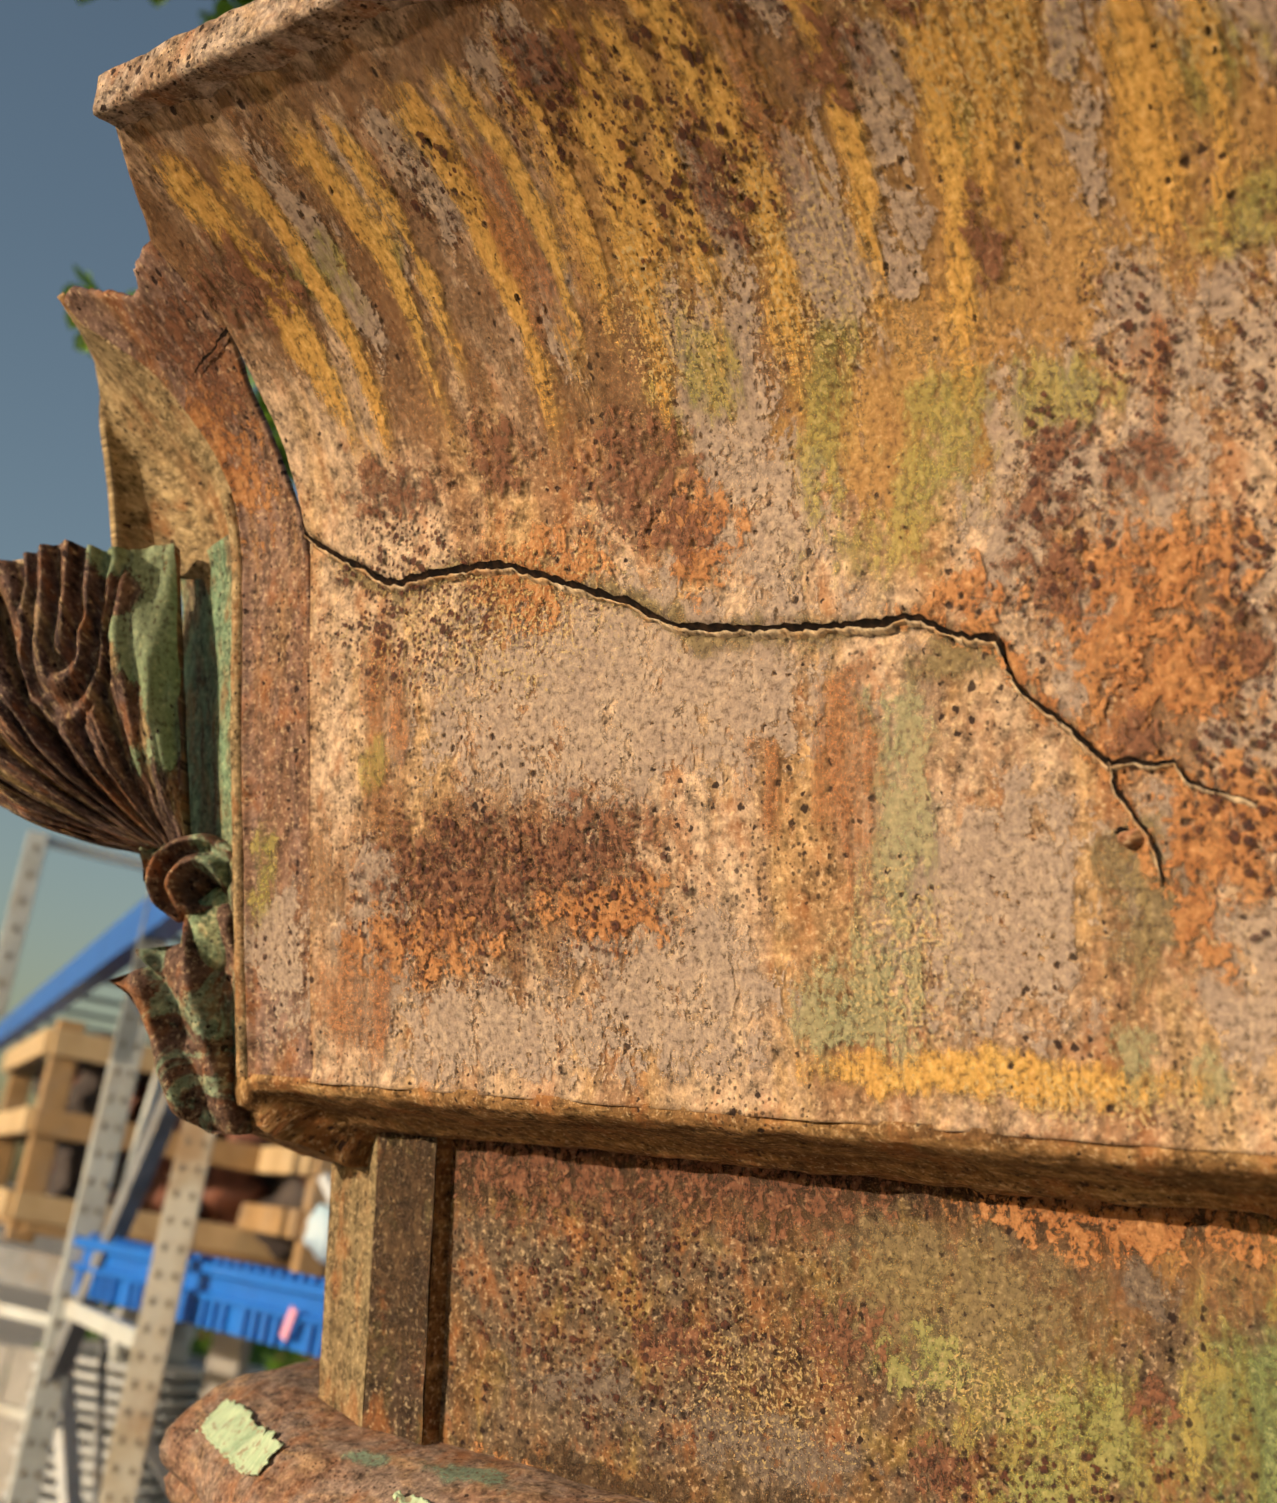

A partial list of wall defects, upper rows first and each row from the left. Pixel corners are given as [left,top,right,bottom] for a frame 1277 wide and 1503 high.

leakage [387,0,810,426]
leakage [783,0,888,316]
leakage [892,0,1038,377]
leakage [1096,0,1241,263]
corrosion [127,0,1277,987]
corrosion [310,633,688,1057]
crack [303,529,1258,885]
corrosion [451,1139,1277,1351]
peeling [195,1398,284,1476]
peeling [392,1490,430,1503]